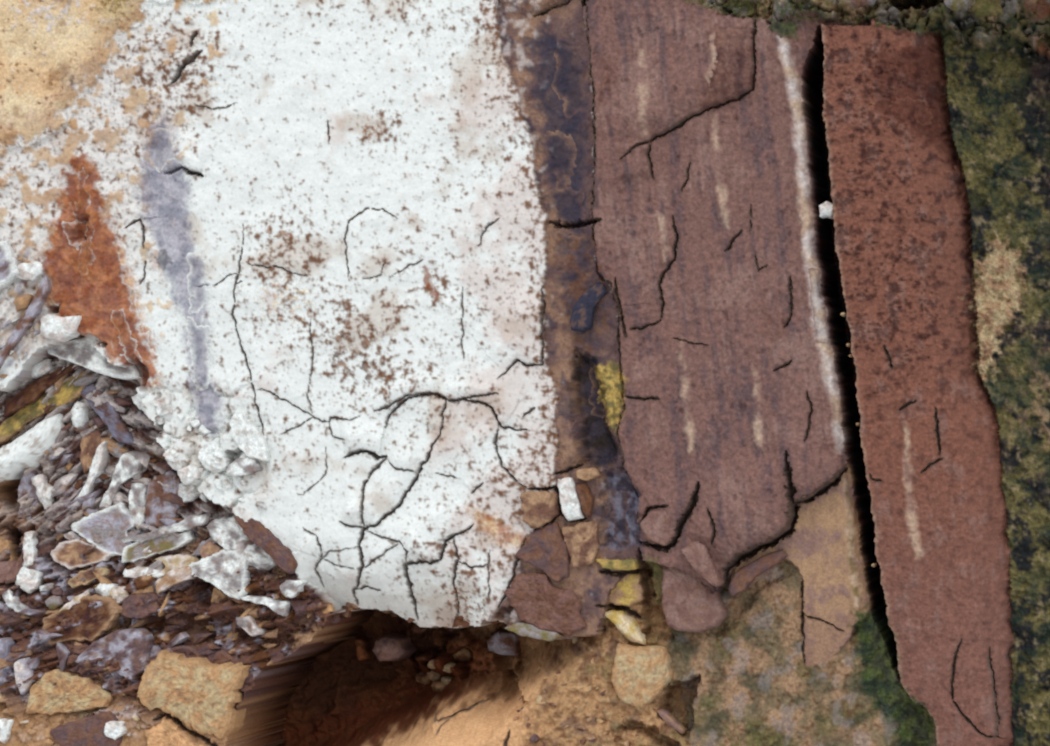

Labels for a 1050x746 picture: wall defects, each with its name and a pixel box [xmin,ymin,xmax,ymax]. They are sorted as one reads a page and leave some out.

crack [532,0,759,249]
rust [37,151,167,394]
crack [123,218,148,285]
crack [342,206,425,281]
peeling [0,275,52,385]
crack [593,44,886,622]
crack [210,223,588,622]
peeling [0,337,298,640]
peeling [5,657,34,695]
peeling [50,711,123,746]
peeling [69,628,167,682]
crack [798,578,845,665]